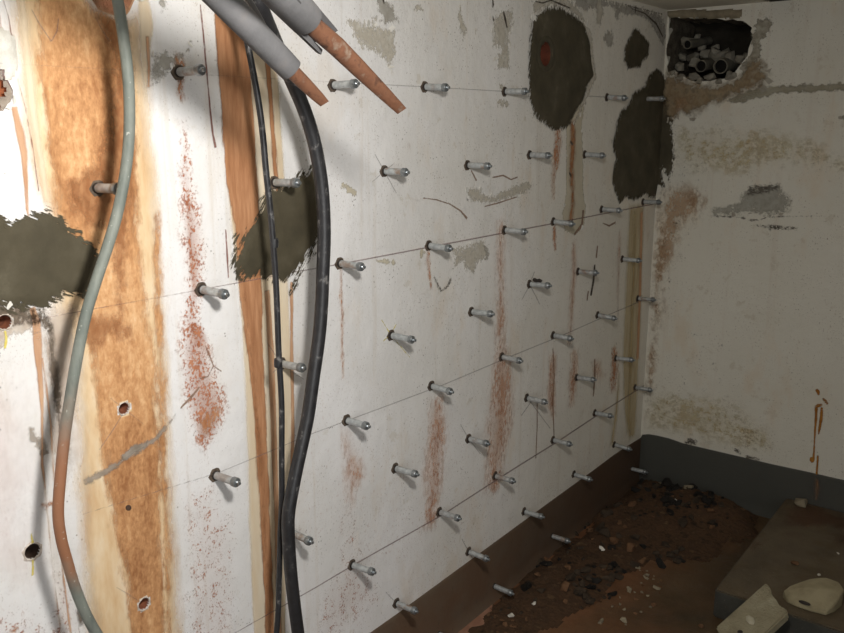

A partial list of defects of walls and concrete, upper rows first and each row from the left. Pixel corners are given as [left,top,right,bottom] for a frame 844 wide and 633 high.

spalling [0,27,18,111]
corrosion [12,107,39,214]
peeling [124,0,193,87]
peeling [349,0,399,68]
peeling [491,0,515,69]
spalling [531,0,844,237]
peeling [0,300,50,347]
corrosion [179,134,225,447]
corrosion [200,5,295,633]
corrosion [30,307,54,483]
corrosion [810,389,828,475]
corrosion [189,491,232,633]